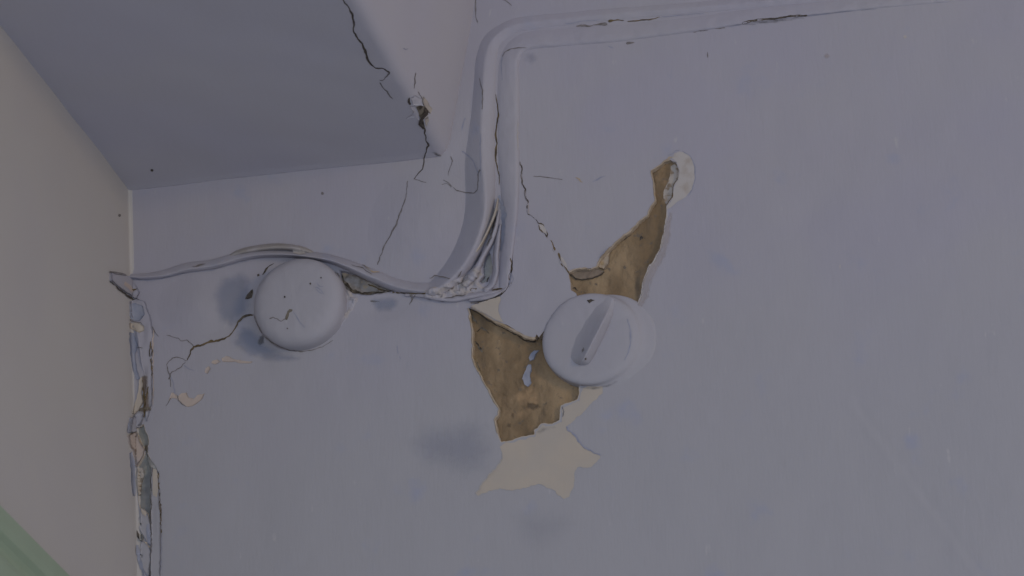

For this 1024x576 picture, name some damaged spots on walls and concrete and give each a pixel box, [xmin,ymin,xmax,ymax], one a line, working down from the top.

peeling [109,271,162,576]
crack [166,290,253,394]
spalling [339,195,603,499]
crack [342,0,605,305]
spalling [569,150,696,304]
crack [565,8,877,48]